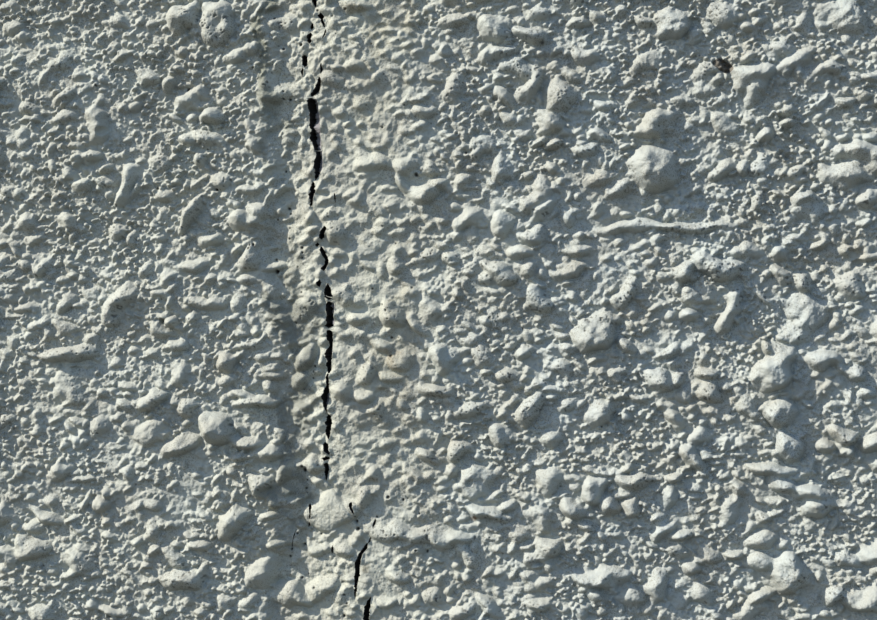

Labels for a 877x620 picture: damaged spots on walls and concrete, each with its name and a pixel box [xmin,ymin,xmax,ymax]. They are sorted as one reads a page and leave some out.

crack [300,0,336,207]
crack [314,226,336,481]
crack [291,503,312,548]
crack [348,502,377,620]